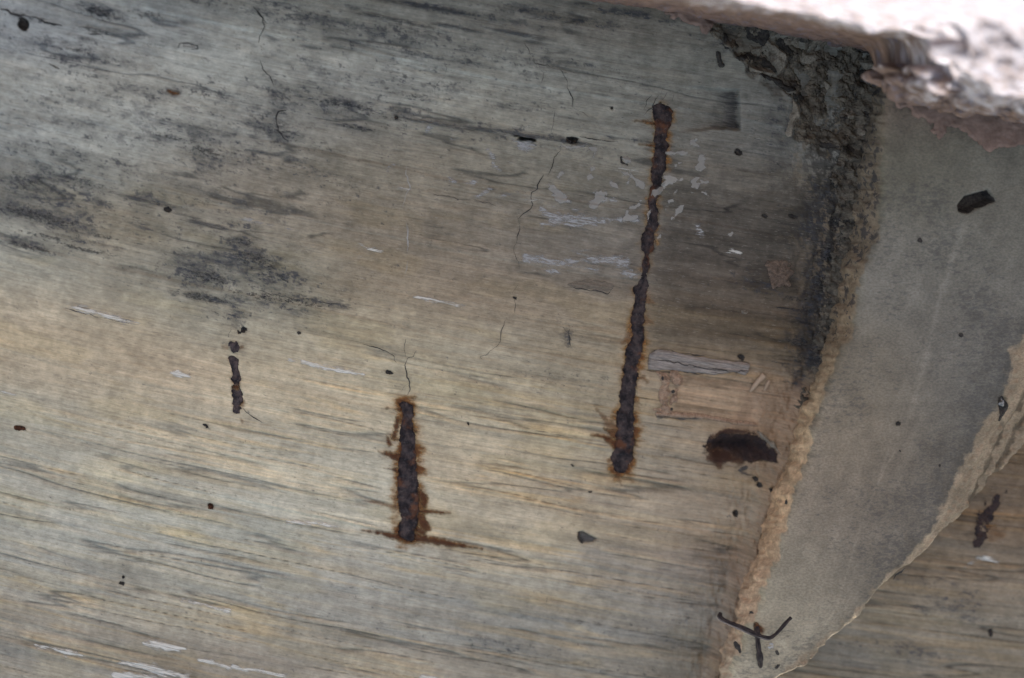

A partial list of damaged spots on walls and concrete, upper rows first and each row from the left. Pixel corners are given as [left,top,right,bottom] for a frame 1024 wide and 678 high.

corrosion [592,103,674,481]
corrosion [228,341,243,414]
corrosion [362,396,483,550]
corrosion [973,490,1007,548]